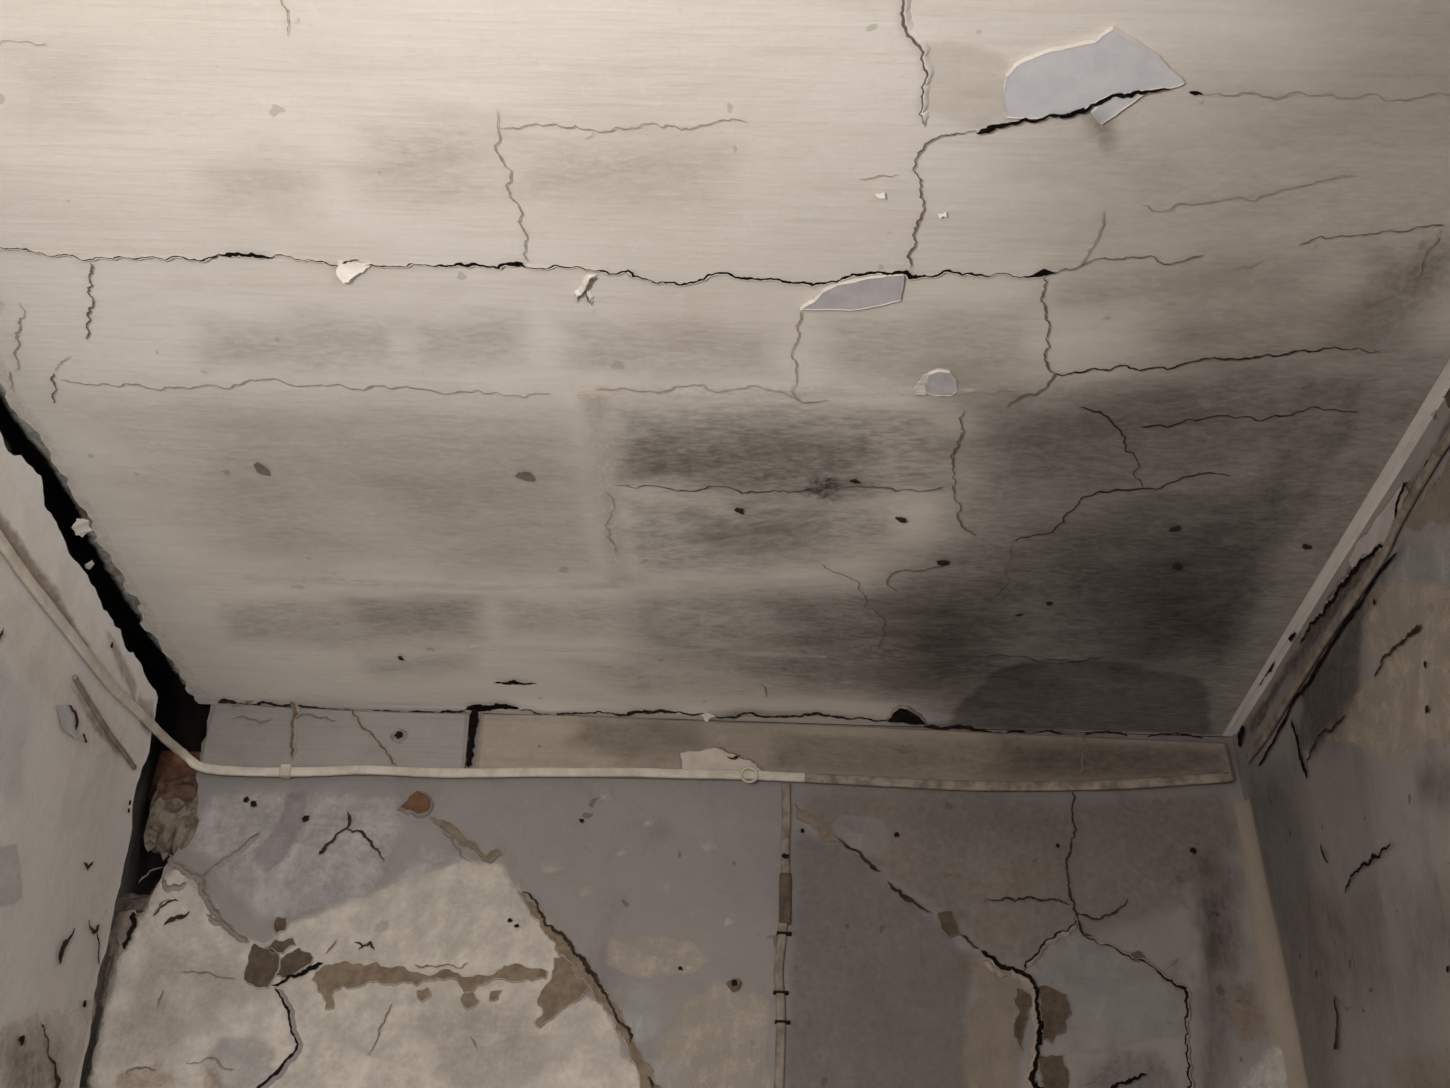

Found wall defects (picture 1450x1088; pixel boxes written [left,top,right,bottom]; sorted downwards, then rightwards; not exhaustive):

peeling [1002,26,1185,125]
crack [0,0,1450,599]
peeling [800,272,905,311]
peeling [913,368,957,396]
crack [822,564,942,648]
crack [1237,452,1433,778]
crack [218,680,1203,770]
crack [838,838,931,913]
peeling [194,790,661,1088]
crack [959,792,1196,1088]